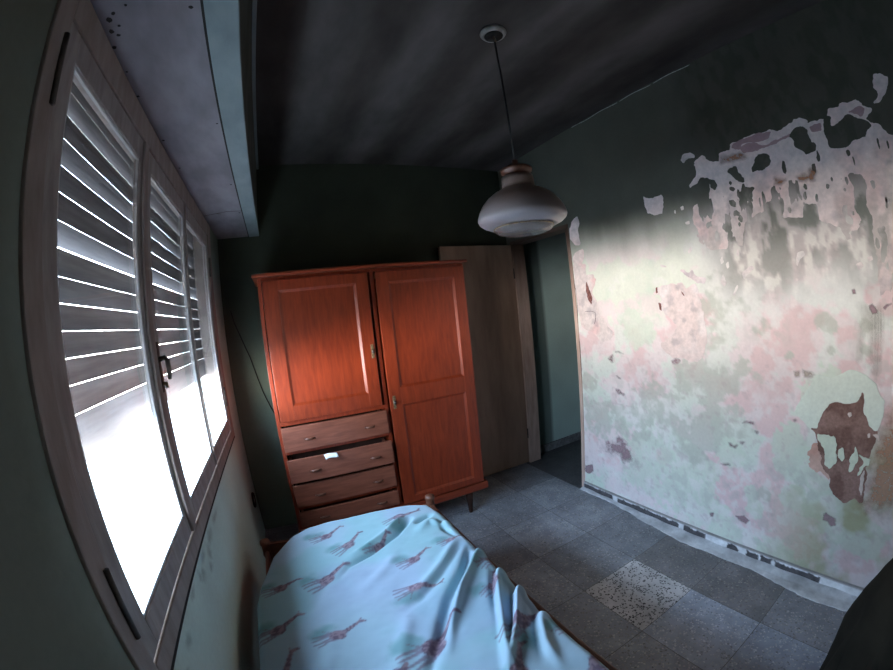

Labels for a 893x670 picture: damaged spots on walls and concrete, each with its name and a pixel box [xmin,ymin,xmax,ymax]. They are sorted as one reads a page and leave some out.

peeling [643,195,664,215]
peeling [674,73,893,313]